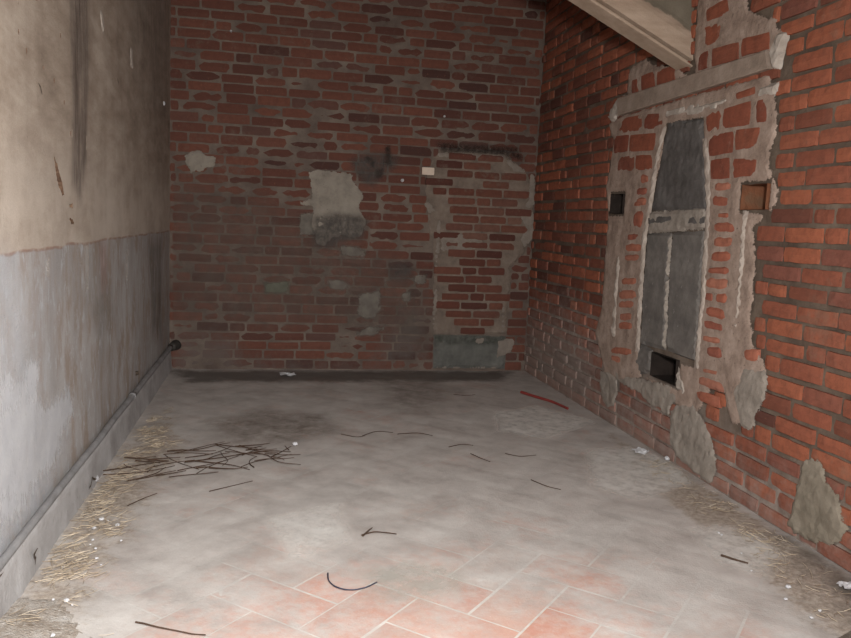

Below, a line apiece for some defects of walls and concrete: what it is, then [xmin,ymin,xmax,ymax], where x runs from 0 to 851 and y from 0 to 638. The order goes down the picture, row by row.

leakage [73,0,88,186]